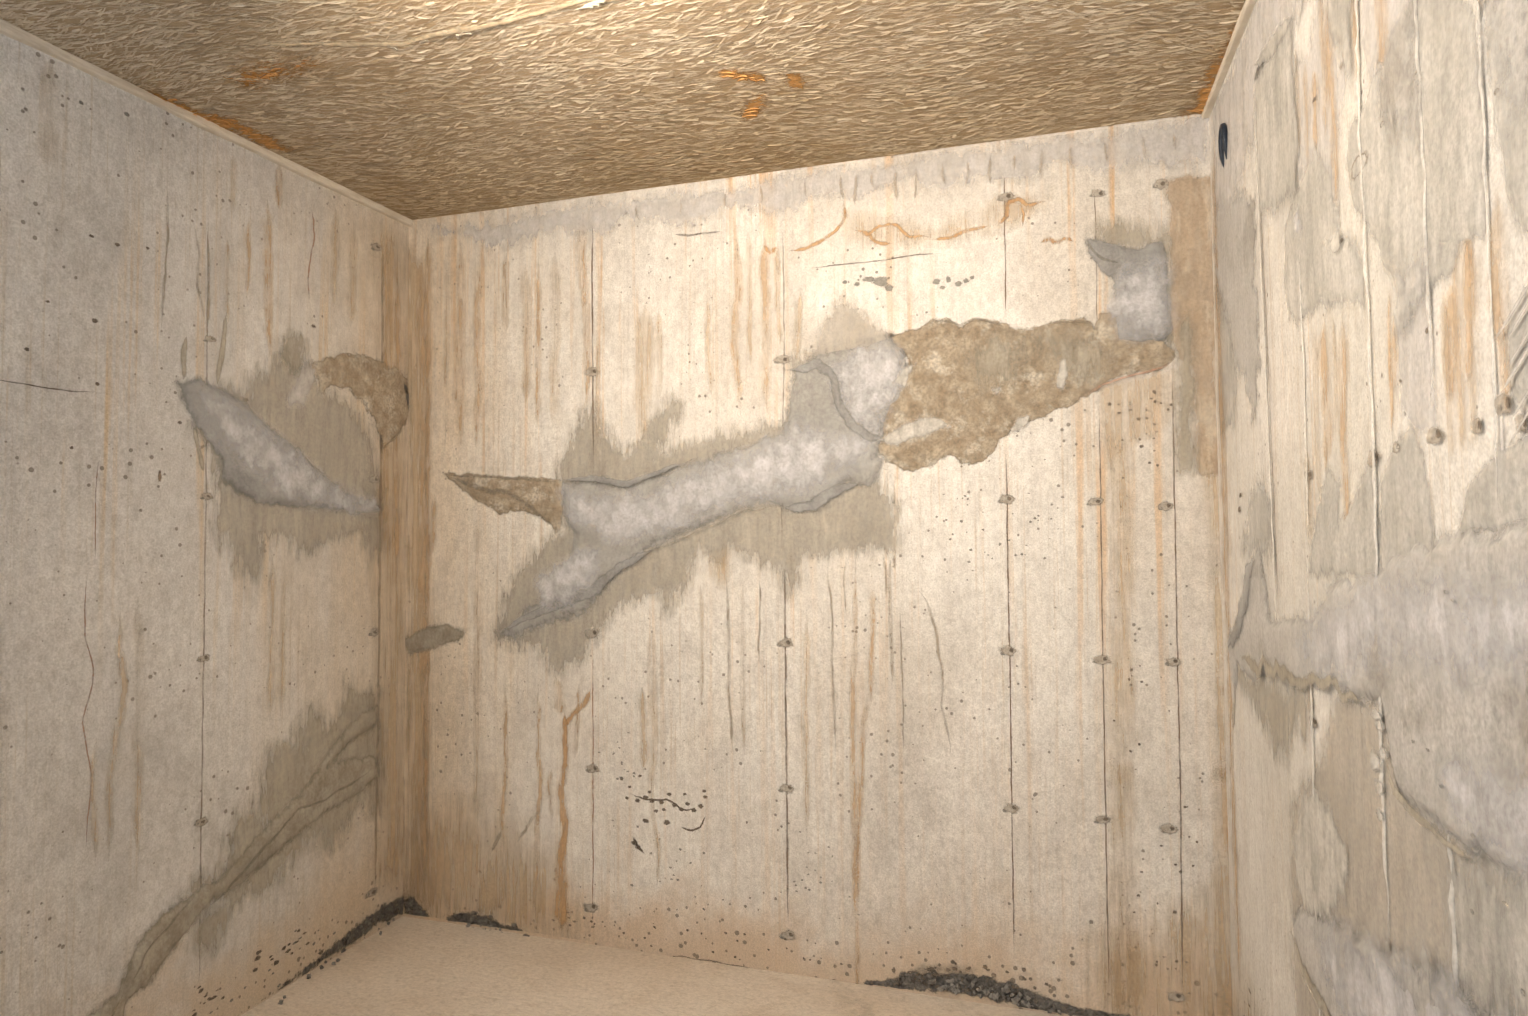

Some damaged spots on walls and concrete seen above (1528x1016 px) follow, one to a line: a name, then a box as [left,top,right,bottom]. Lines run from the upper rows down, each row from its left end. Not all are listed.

spalling [289,353,409,448]
spalling [878,313,1175,472]
water stain [90,689,385,1016]
rust [523,692,590,924]
water stain [1227,518,1528,1016]